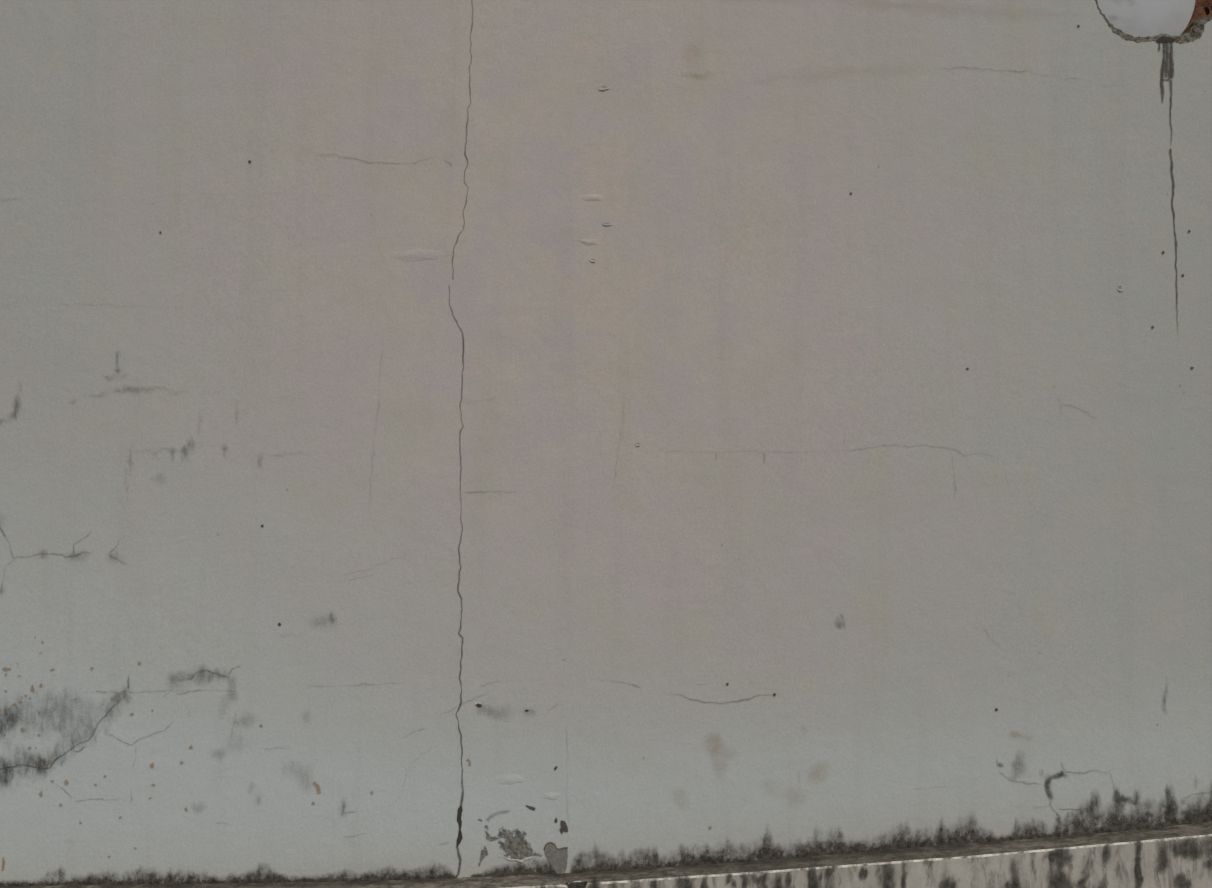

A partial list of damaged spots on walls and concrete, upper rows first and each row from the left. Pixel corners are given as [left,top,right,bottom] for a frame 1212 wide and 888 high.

spalling [1095,0,1212,44]
crack [456,522,464,877]
leakage [0,757,52,782]
leakage [0,868,455,887]
peeling [478,818,588,888]
leakage [472,789,1212,888]